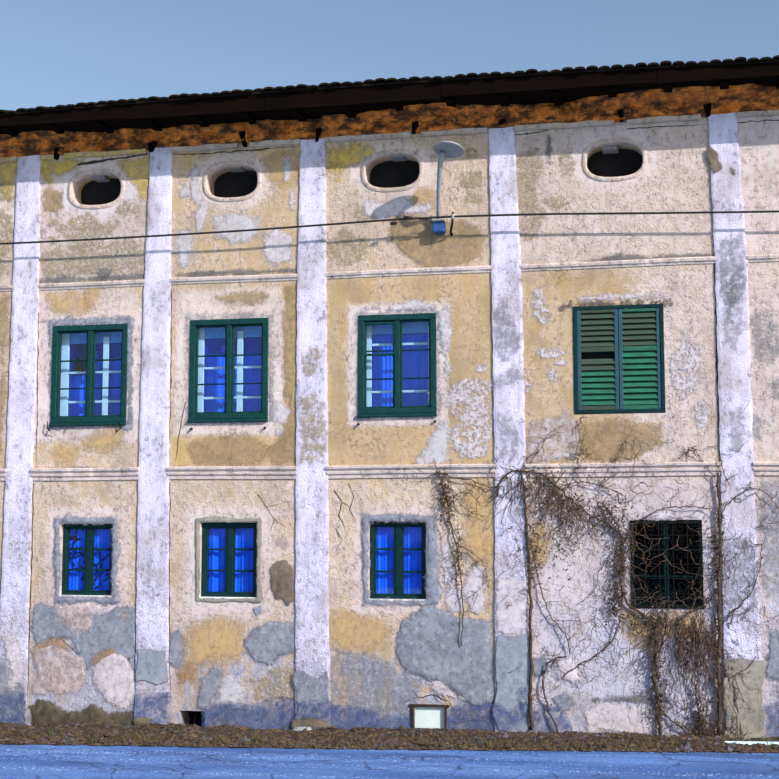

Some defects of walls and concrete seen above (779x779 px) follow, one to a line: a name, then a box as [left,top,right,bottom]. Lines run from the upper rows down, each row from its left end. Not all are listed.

spalling [705,147,736,175]
peeling [173,165,293,268]
peeling [530,287,674,328]
peeling [365,299,454,375]
peeling [535,347,568,381]
peeling [669,337,704,400]
peeling [416,364,494,464]
crack [334,484,354,548]
spalling [269,560,295,606]
peeling [56,606,92,632]
peeling [216,673,244,706]
peeling [429,681,465,700]